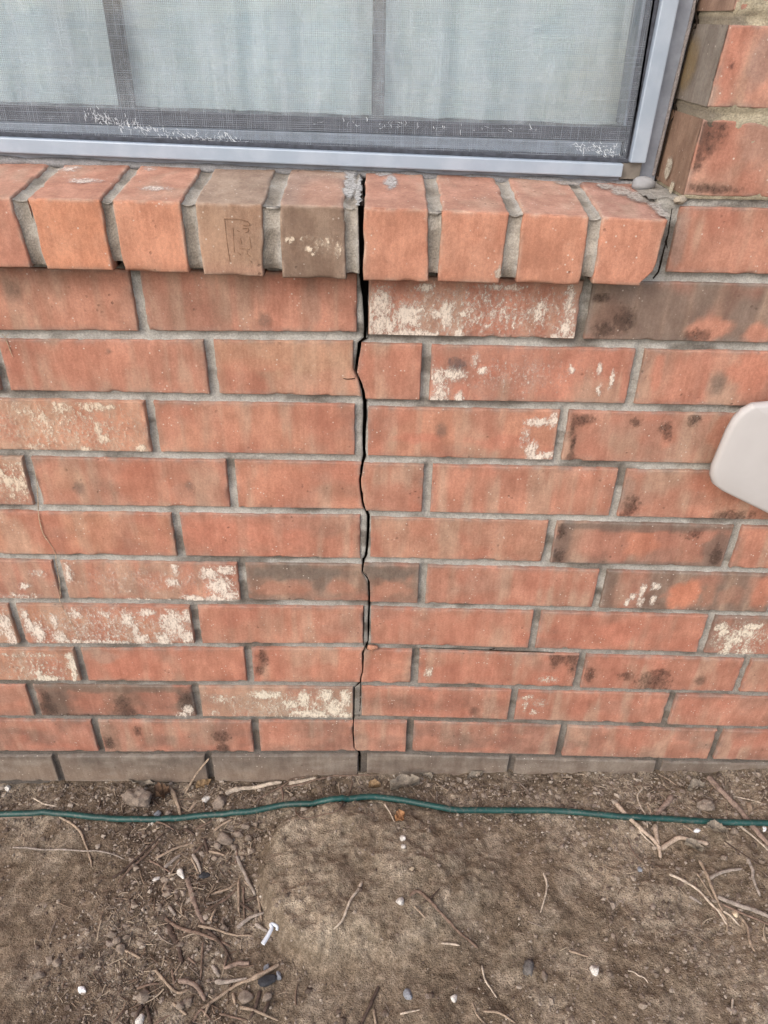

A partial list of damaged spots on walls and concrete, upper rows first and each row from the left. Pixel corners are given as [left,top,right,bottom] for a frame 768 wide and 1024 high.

water stain [369,283,576,338]
water stain [430,356,496,401]
water stain [0,402,146,452]
water stain [520,413,558,460]
crack [343,183,370,762]
water stain [0,564,239,681]
water stain [713,623,768,655]
water stain [248,689,352,718]